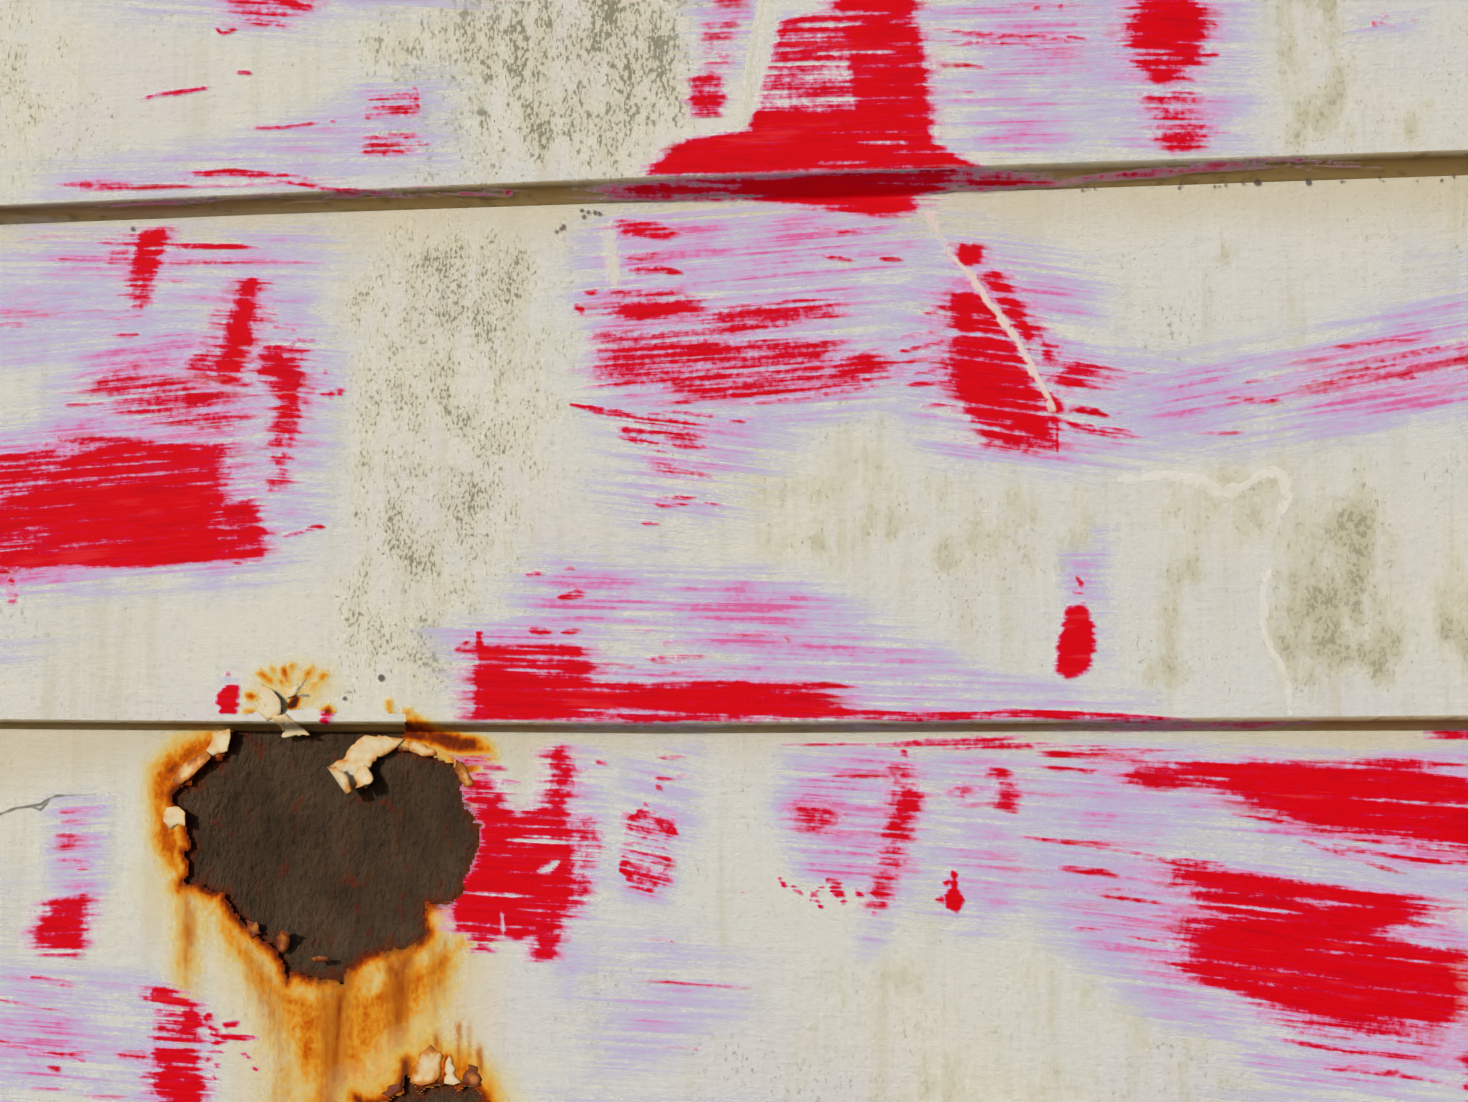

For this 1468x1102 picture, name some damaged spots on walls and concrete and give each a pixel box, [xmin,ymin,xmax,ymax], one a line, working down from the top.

damp [358,0,710,186]
damp [333,218,580,702]
damp [1271,440,1418,700]
damp [1440,594,1468,660]
corrosion [243,662,337,738]
peeling [172,729,231,785]
peeling [327,735,437,796]
crack [0,794,73,815]
peeling [163,806,185,830]
corrosion [146,699,507,1102]